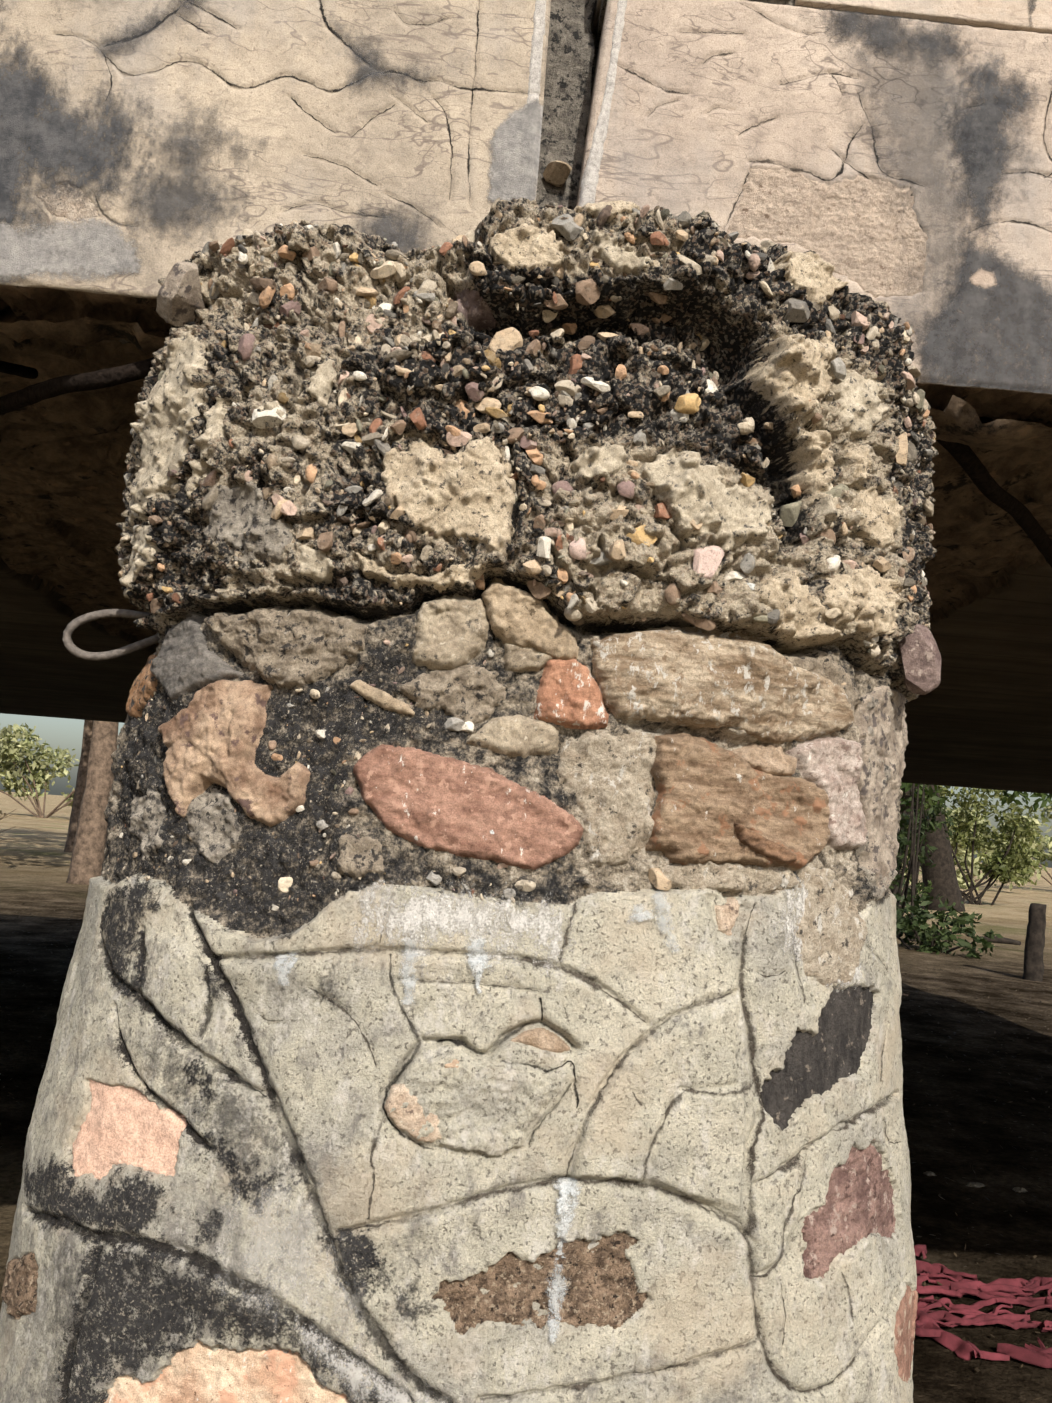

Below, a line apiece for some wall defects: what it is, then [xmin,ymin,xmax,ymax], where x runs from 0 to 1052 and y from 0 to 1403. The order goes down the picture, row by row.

water stain [99,0,203,56]
water stain [349,42,418,86]
crack [682,10,773,63]
water stain [831,9,961,55]
water stain [0,37,235,235]
crack [55,0,540,227]
crack [619,66,925,232]
crack [1004,91,1052,178]
water stain [360,209,424,253]
spalling [727,168,928,298]
water stain [917,60,1052,394]
crack [969,220,1052,233]